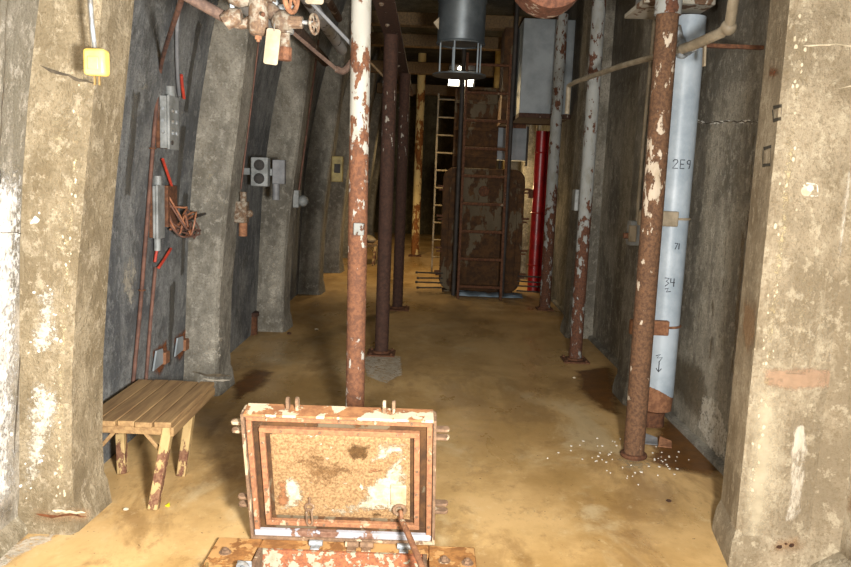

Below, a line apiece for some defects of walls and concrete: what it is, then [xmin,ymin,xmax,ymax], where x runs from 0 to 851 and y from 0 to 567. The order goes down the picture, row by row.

crack [0,2,8,143]
crack [40,65,94,84]
leakage [19,383,61,489]
leakage [579,368,617,413]
leakage [786,426,806,519]